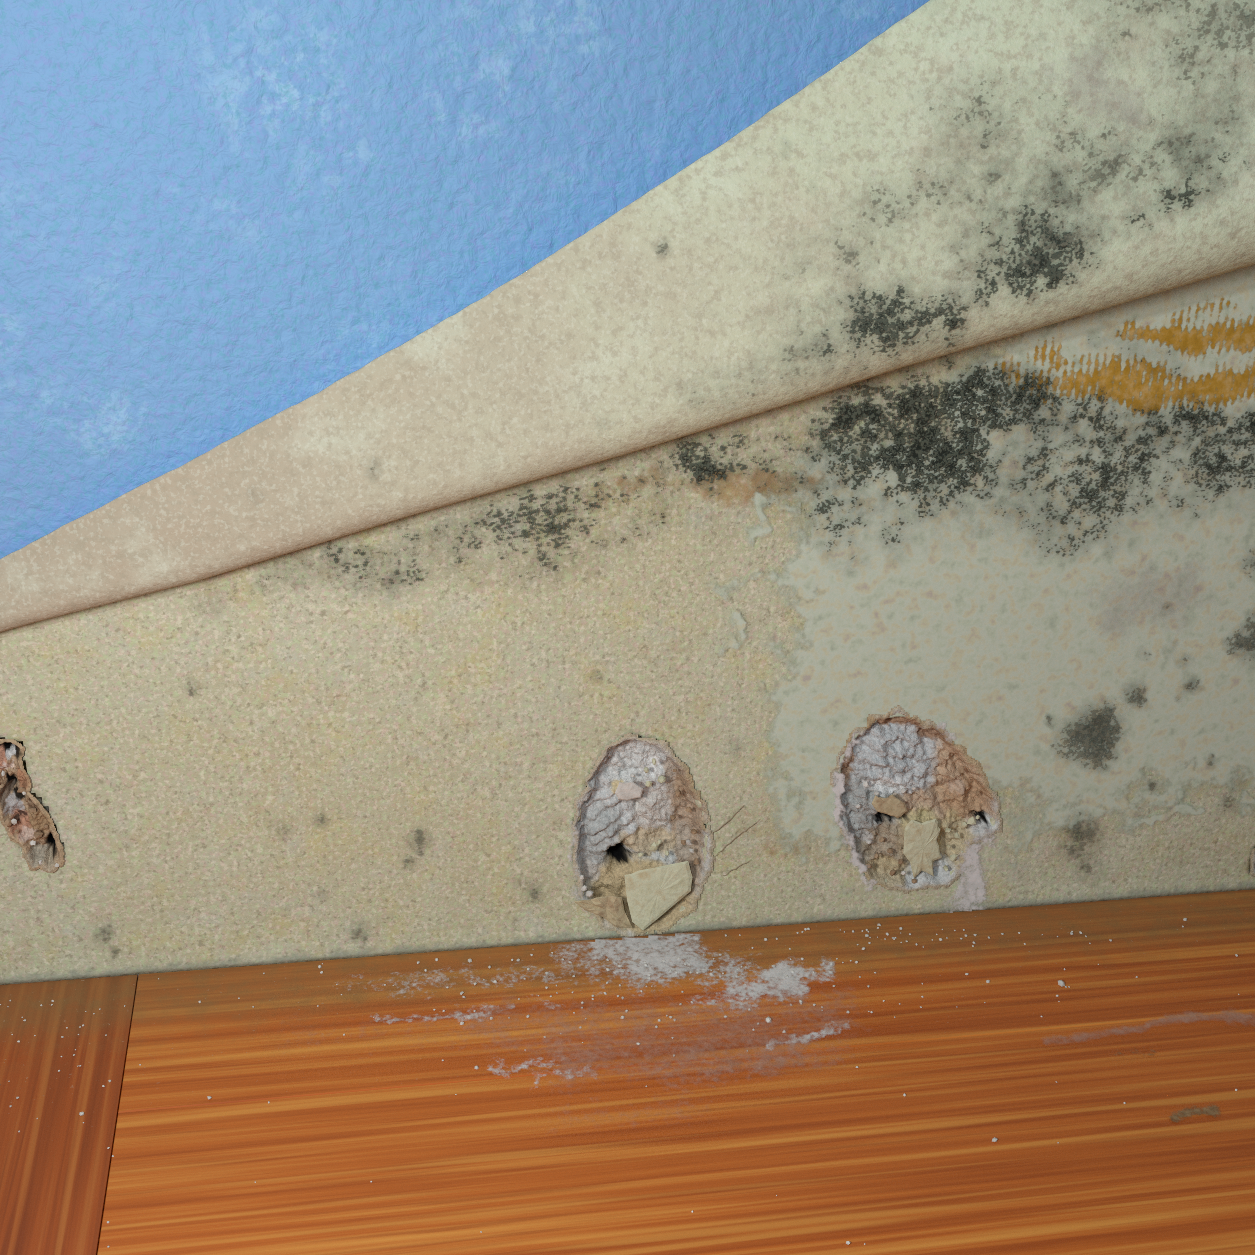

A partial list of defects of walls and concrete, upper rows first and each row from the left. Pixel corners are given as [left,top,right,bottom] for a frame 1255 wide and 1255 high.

water stain [1107,0,1255,96]
water stain [953,78,1001,149]
water stain [434,110,1255,578]
peeling [0,0,1255,894]
water stain [322,526,428,590]
water stain [1227,617,1255,661]
water stain [1046,686,1147,770]
flaking render [571,733,715,937]
water stain [832,733,877,891]
water stain [950,829,995,913]
water stain [1062,812,1103,873]